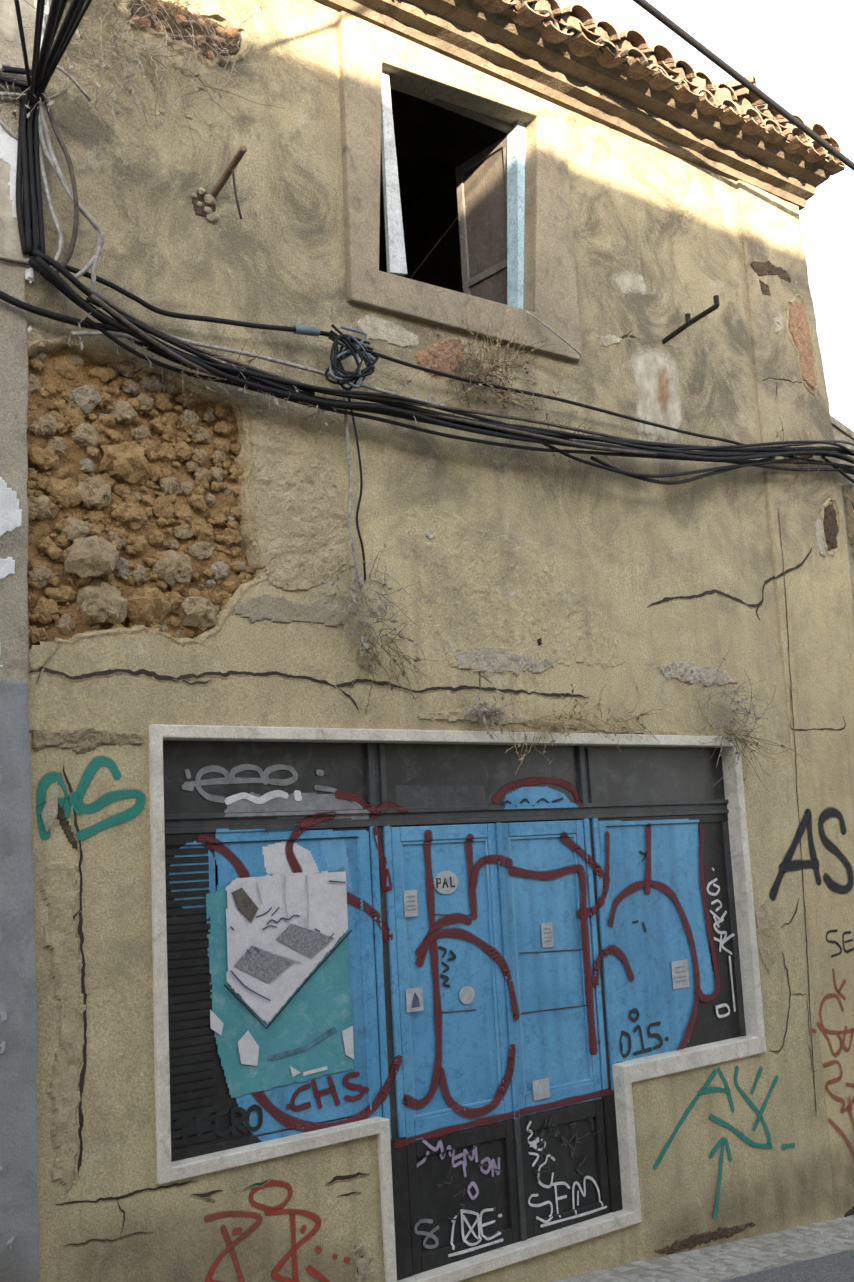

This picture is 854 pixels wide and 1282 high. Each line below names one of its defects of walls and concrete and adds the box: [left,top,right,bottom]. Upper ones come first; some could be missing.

peeling [0,125,38,235]
spalling [414,339,465,377]
spalling [750,261,817,398]
flaking render [0,335,348,670]
crack [28,667,590,715]
crack [646,517,846,1108]
crack [54,762,273,1247]
crack [326,1172,370,1198]